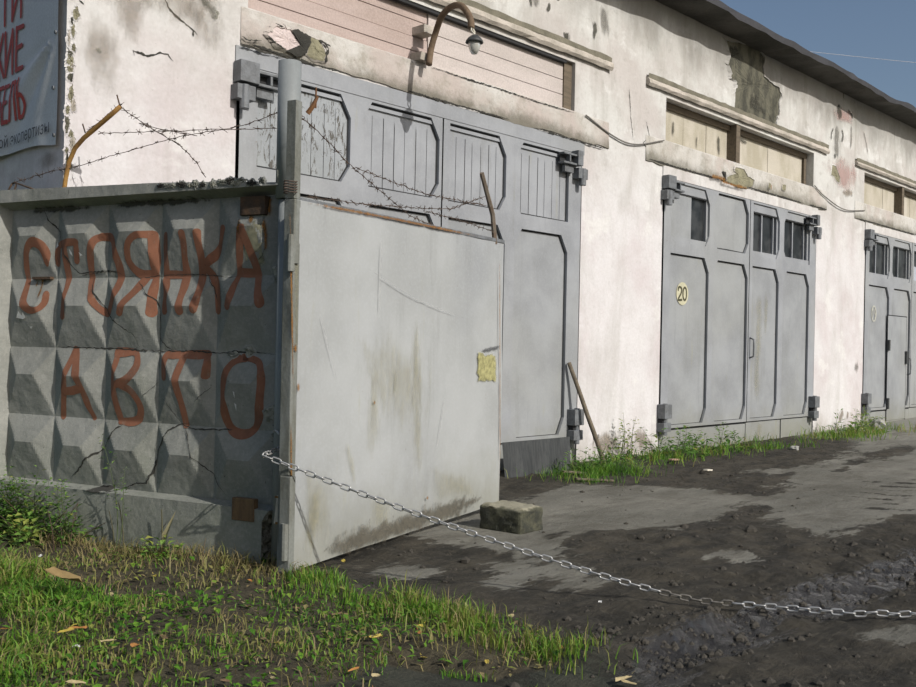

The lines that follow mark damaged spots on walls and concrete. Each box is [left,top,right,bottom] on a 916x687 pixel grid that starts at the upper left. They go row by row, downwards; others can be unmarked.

crack [165,0,196,37]
crack [133,50,173,61]
spalling [286,29,327,64]
spalling [722,36,783,127]
crack [45,213,269,493]